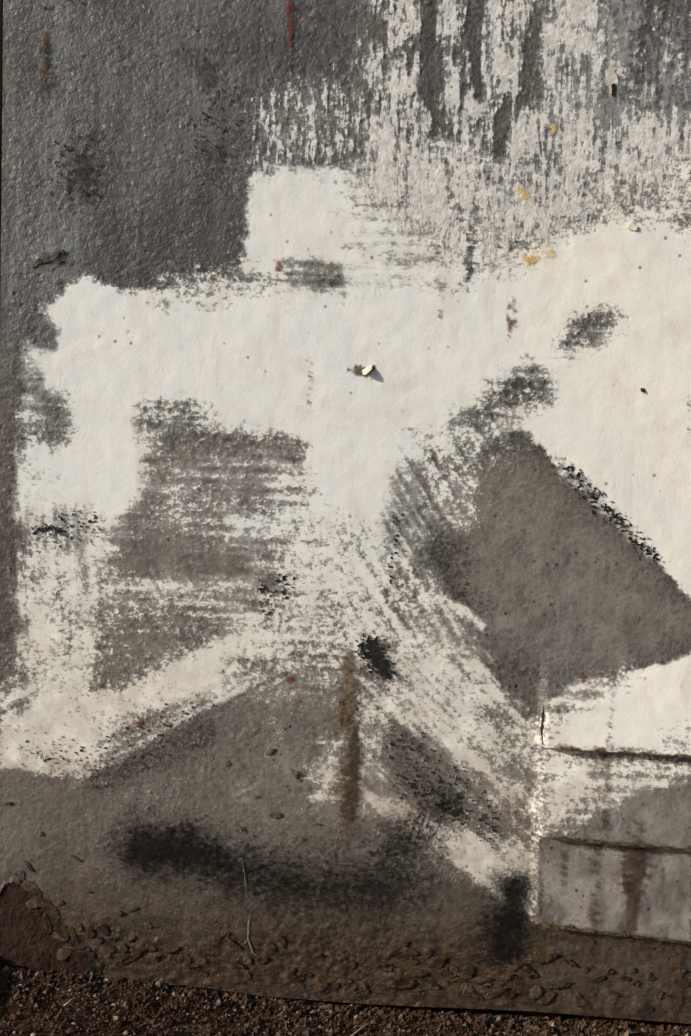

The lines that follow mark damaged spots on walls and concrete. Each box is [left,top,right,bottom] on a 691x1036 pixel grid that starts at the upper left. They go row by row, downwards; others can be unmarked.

water stain [335,642,361,826]
peeling [0,859,192,975]